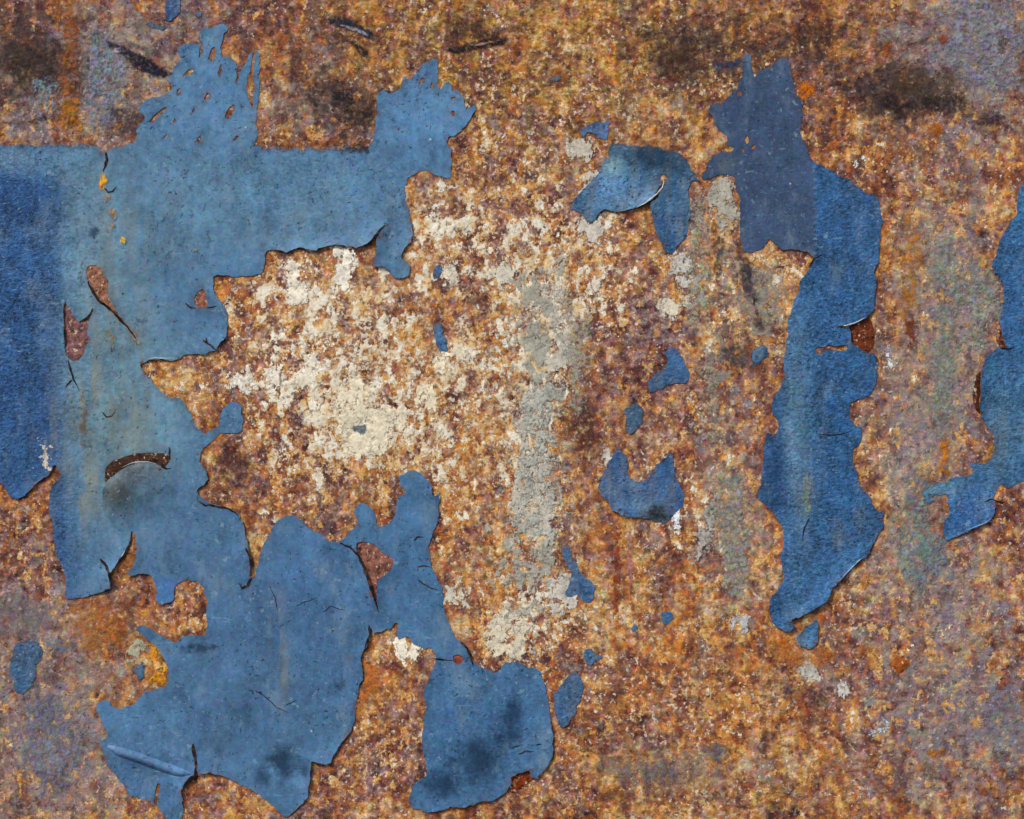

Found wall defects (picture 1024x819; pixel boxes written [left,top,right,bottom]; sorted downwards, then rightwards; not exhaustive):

peeling [147,0,181,30]
corrosion [64,304,93,361]
corrosion [86,265,140,344]
peeling [570,54,883,649]
corrosion [849,318,875,353]
peeling [923,183,1024,541]
peeling [0,12,584,819]
corrosion [105,453,170,482]
corrosion [117,532,137,575]
corrosion [356,542,394,607]
peeling [563,547,595,603]
peeling [584,649,602,666]